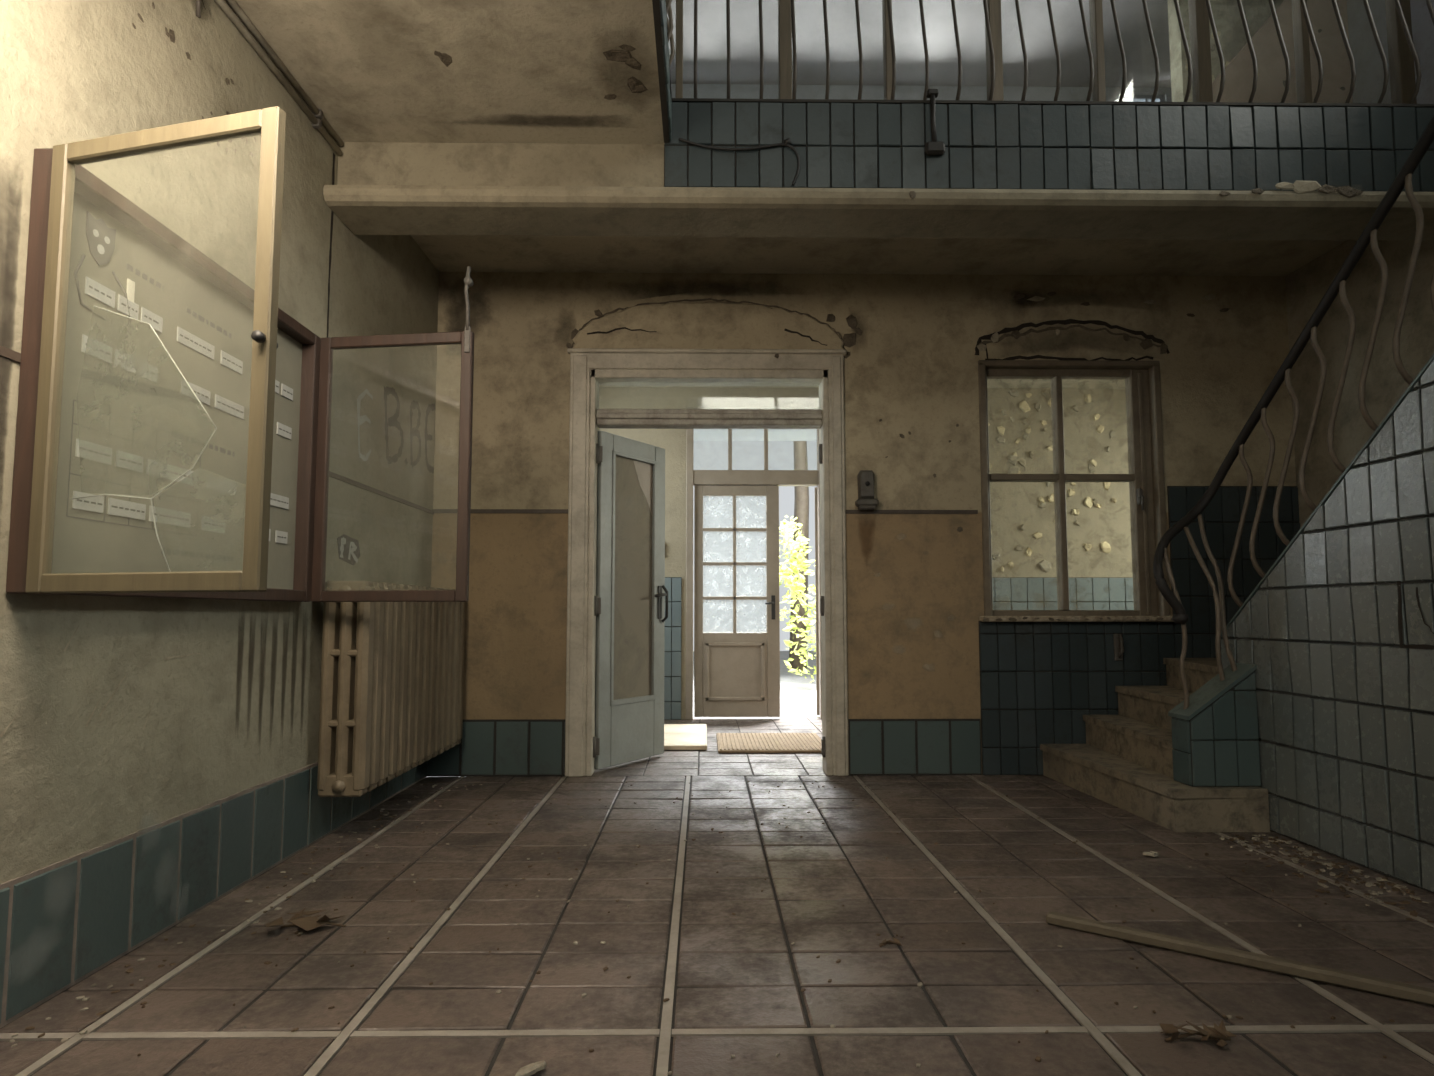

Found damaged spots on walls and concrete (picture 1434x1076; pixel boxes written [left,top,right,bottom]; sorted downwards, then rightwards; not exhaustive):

water stain [498,116,596,126]
crack [975,319,1170,361]